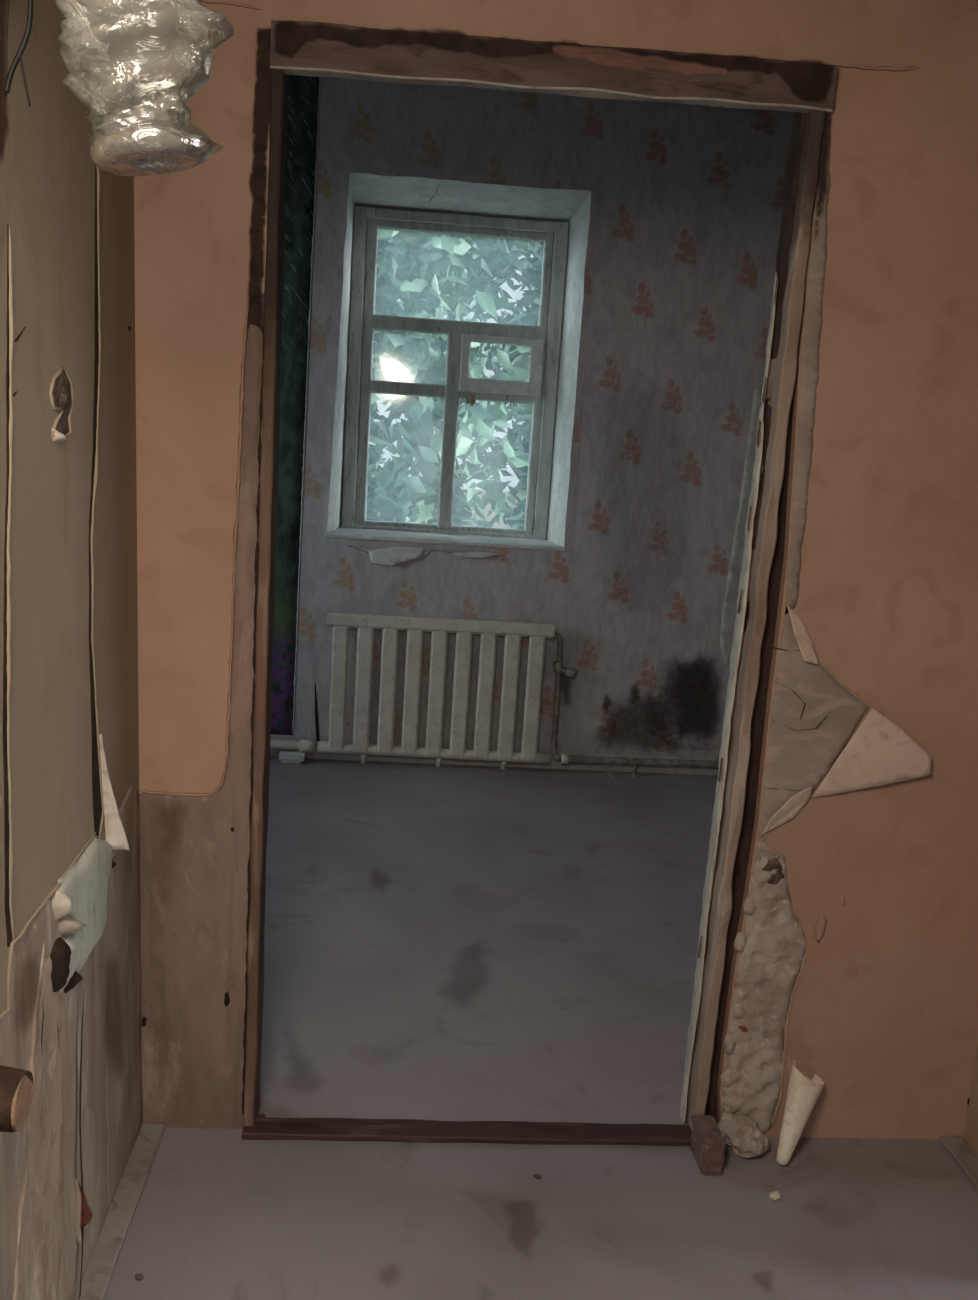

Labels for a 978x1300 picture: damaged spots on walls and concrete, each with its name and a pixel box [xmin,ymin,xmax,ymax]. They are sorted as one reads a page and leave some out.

peeling [0,294,264,1300]
water stain [604,660,717,748]
peeling [720,113,932,1165]